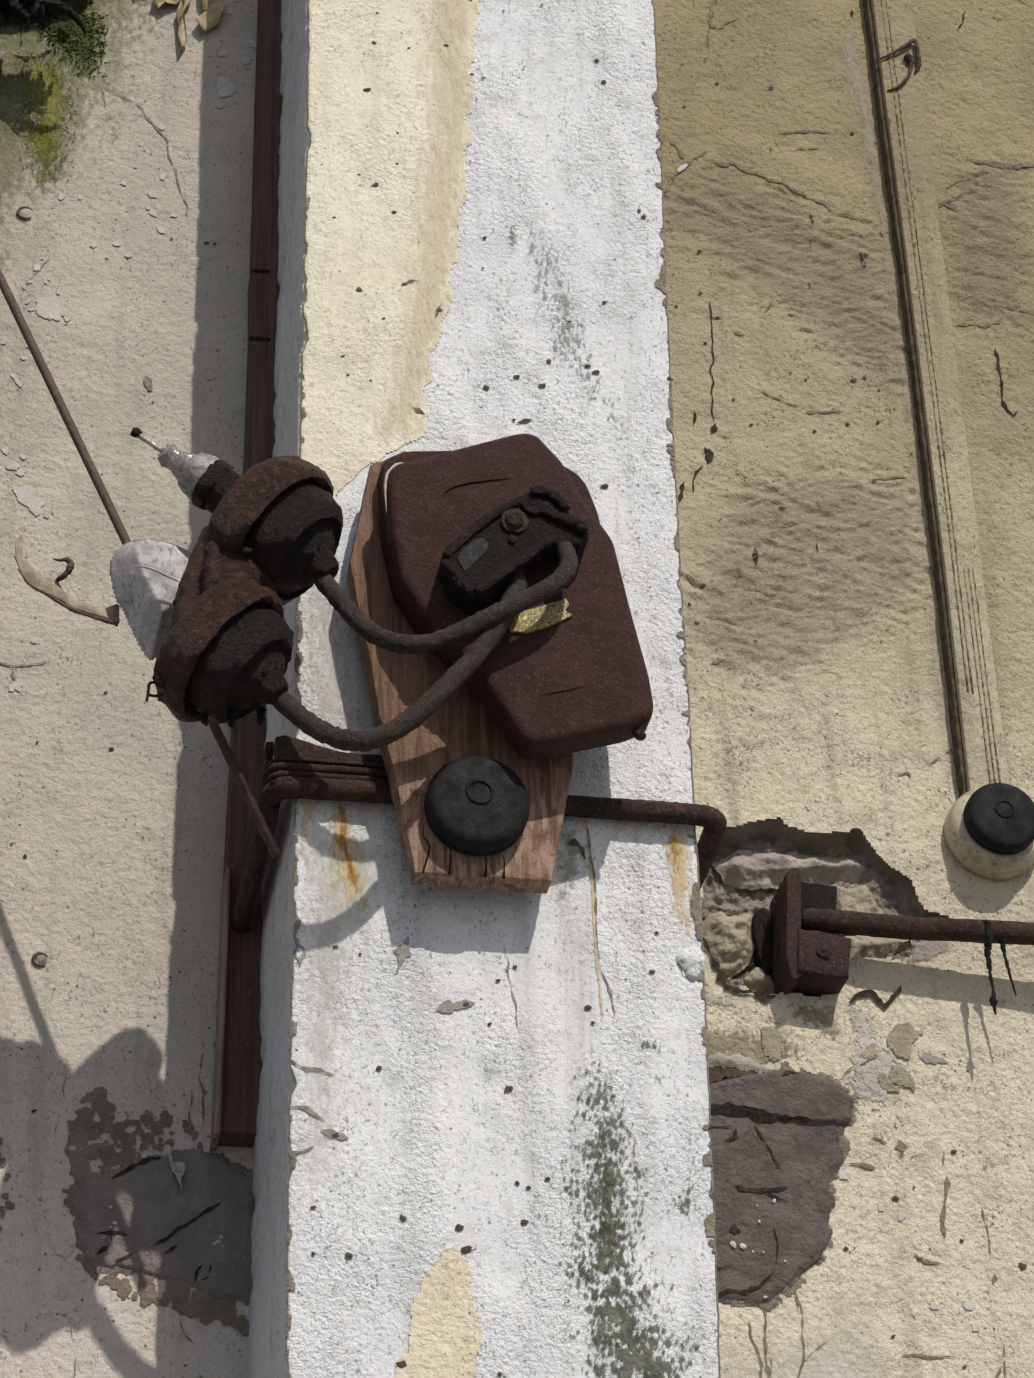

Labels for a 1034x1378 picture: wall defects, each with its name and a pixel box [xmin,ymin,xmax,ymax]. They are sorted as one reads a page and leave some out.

leakage [20,56,71,187]
crack [87,69,188,214]
peeling [298,0,484,501]
spalling [637,0,700,804]
crack [678,302,908,625]
crack [956,301,1033,416]
rust [330,802,365,905]
peeling [61,1087,253,1336]
leakage [588,1148,635,1275]
leakage [672,1138,695,1219]
crack [708,1101,827,1378]
flaking render [688,817,949,1378]